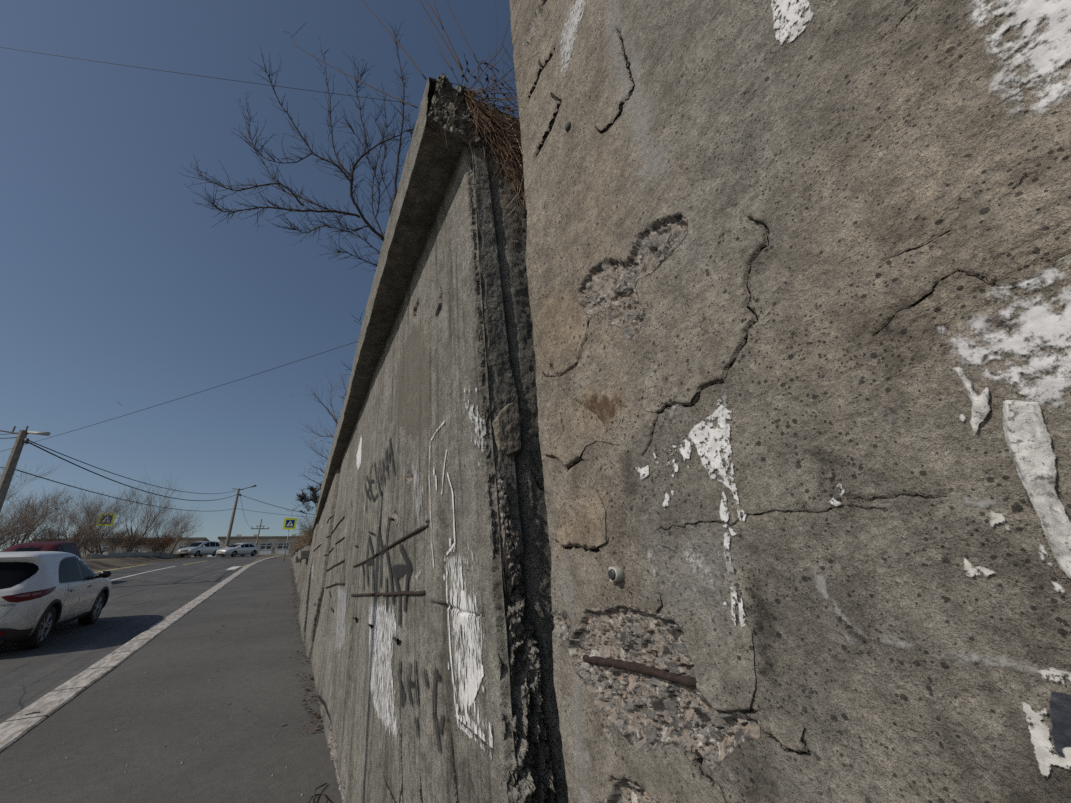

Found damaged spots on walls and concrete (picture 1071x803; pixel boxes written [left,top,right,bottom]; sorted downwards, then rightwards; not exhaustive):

crack [527,34,562,156]
spalling [534,213,688,376]
peeling [638,219,769,413]
crack [649,220,770,446]
crack [885,230,950,260]
crack [873,253,1071,336]
peeling [464,388,522,456]
spalling [496,471,557,803]
spalling [544,397,808,803]
crack [656,493,944,553]